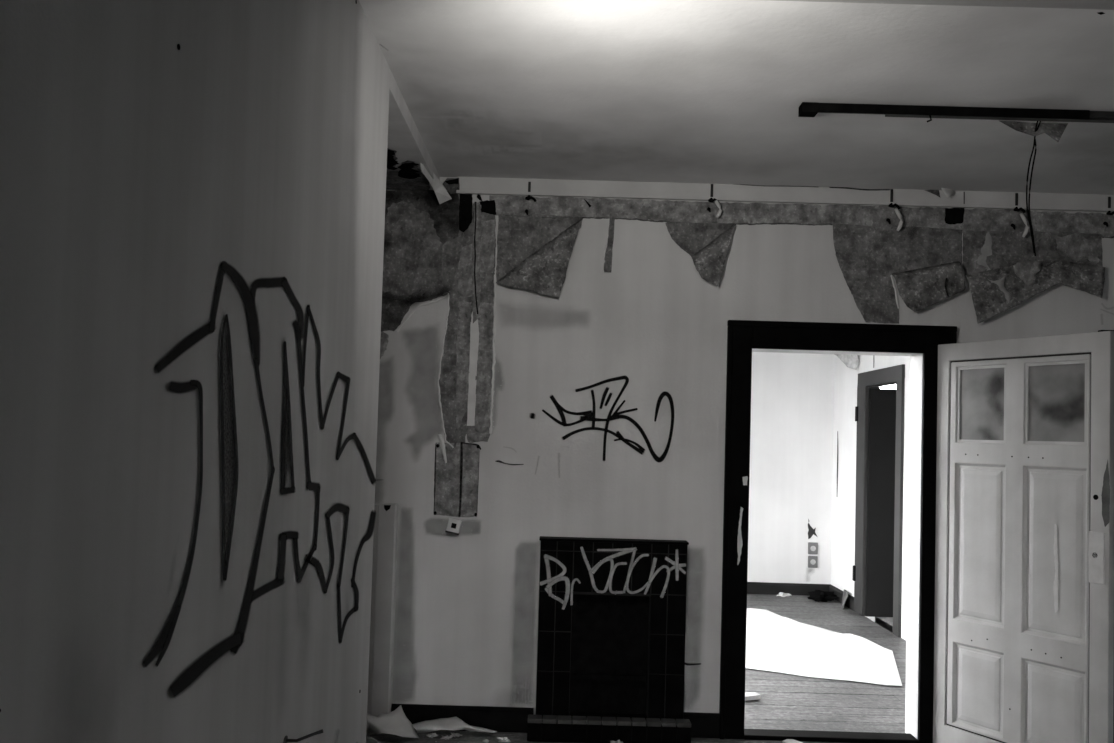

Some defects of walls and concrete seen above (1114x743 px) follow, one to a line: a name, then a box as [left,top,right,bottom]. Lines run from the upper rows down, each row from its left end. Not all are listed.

peeling [380,148,1114,527]